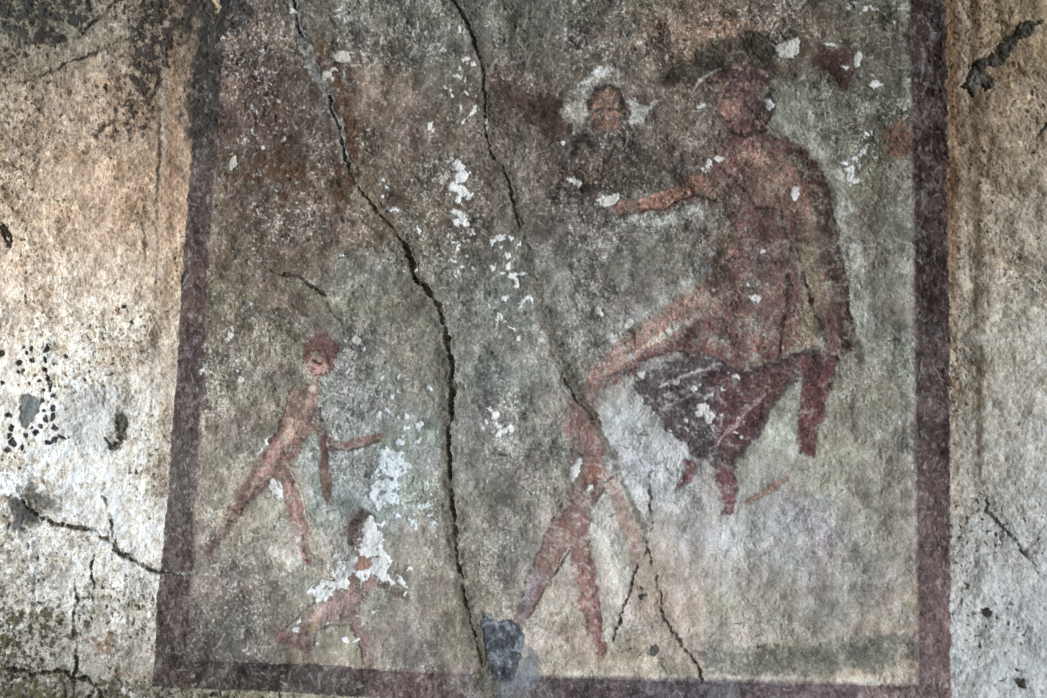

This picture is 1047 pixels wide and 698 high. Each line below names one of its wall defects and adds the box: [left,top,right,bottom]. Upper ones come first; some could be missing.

damp [0,0,100,72]
crack [3,0,139,84]
damp [91,0,238,190]
flaking render [961,19,1044,97]
peeling [445,159,475,278]
crack [274,272,342,321]
crack [289,0,499,698]
peeling [488,234,533,344]
crack [448,0,704,681]
peeling [306,368,436,603]
crack [0,488,238,698]
flaking render [480,612,541,698]